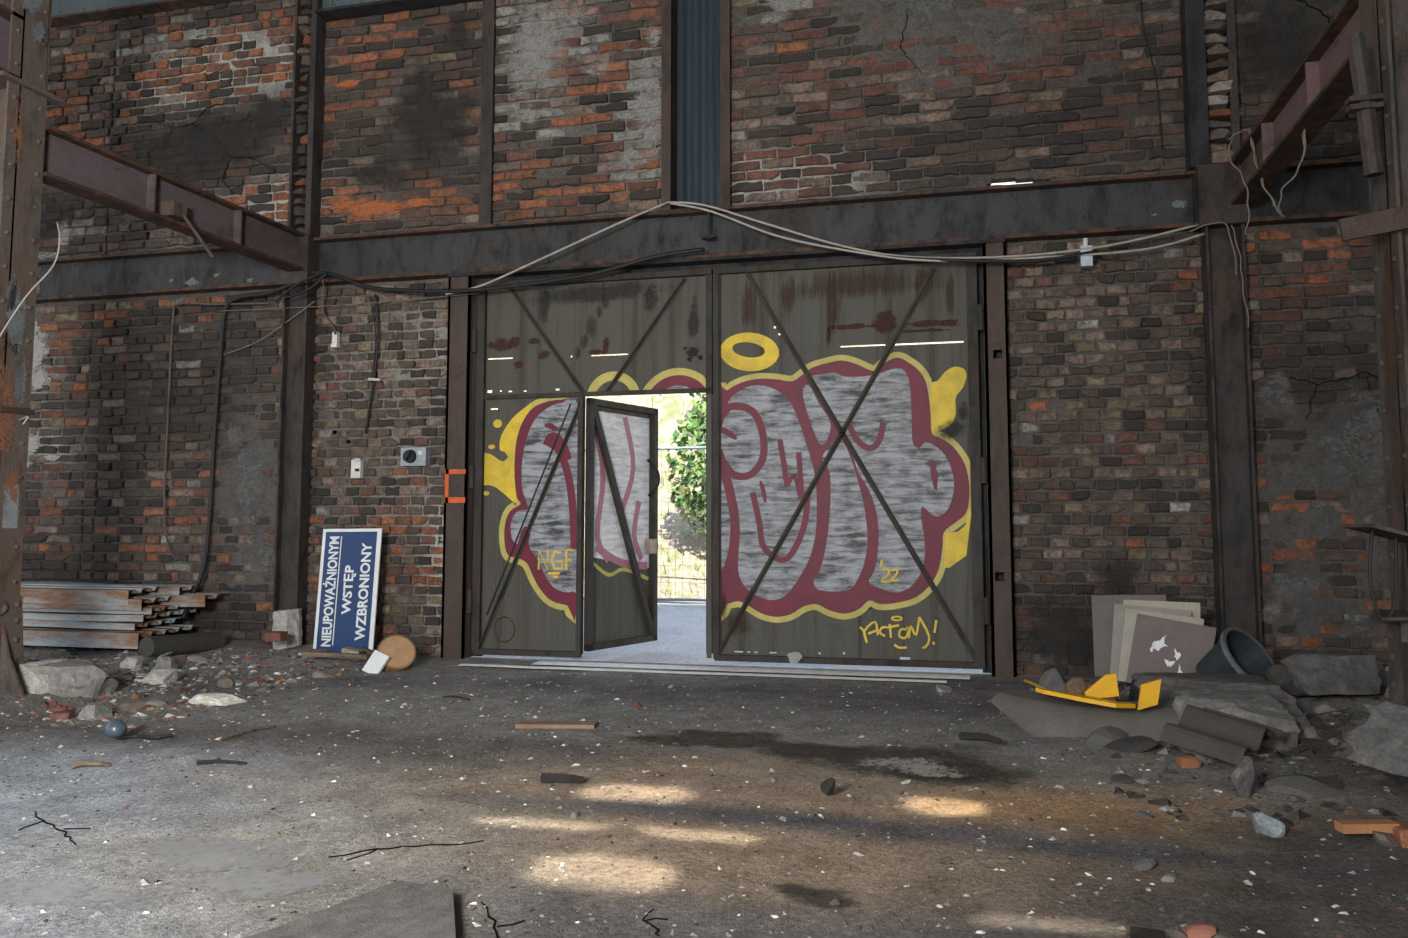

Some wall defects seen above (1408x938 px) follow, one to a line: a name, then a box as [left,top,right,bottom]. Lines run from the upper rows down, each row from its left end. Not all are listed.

crack [1297,0,1333,23]
rust [0,351,23,504]
spalling [27,434,60,468]
water stain [630,730,1032,785]
crack [18,812,91,845]
crack [328,840,483,861]